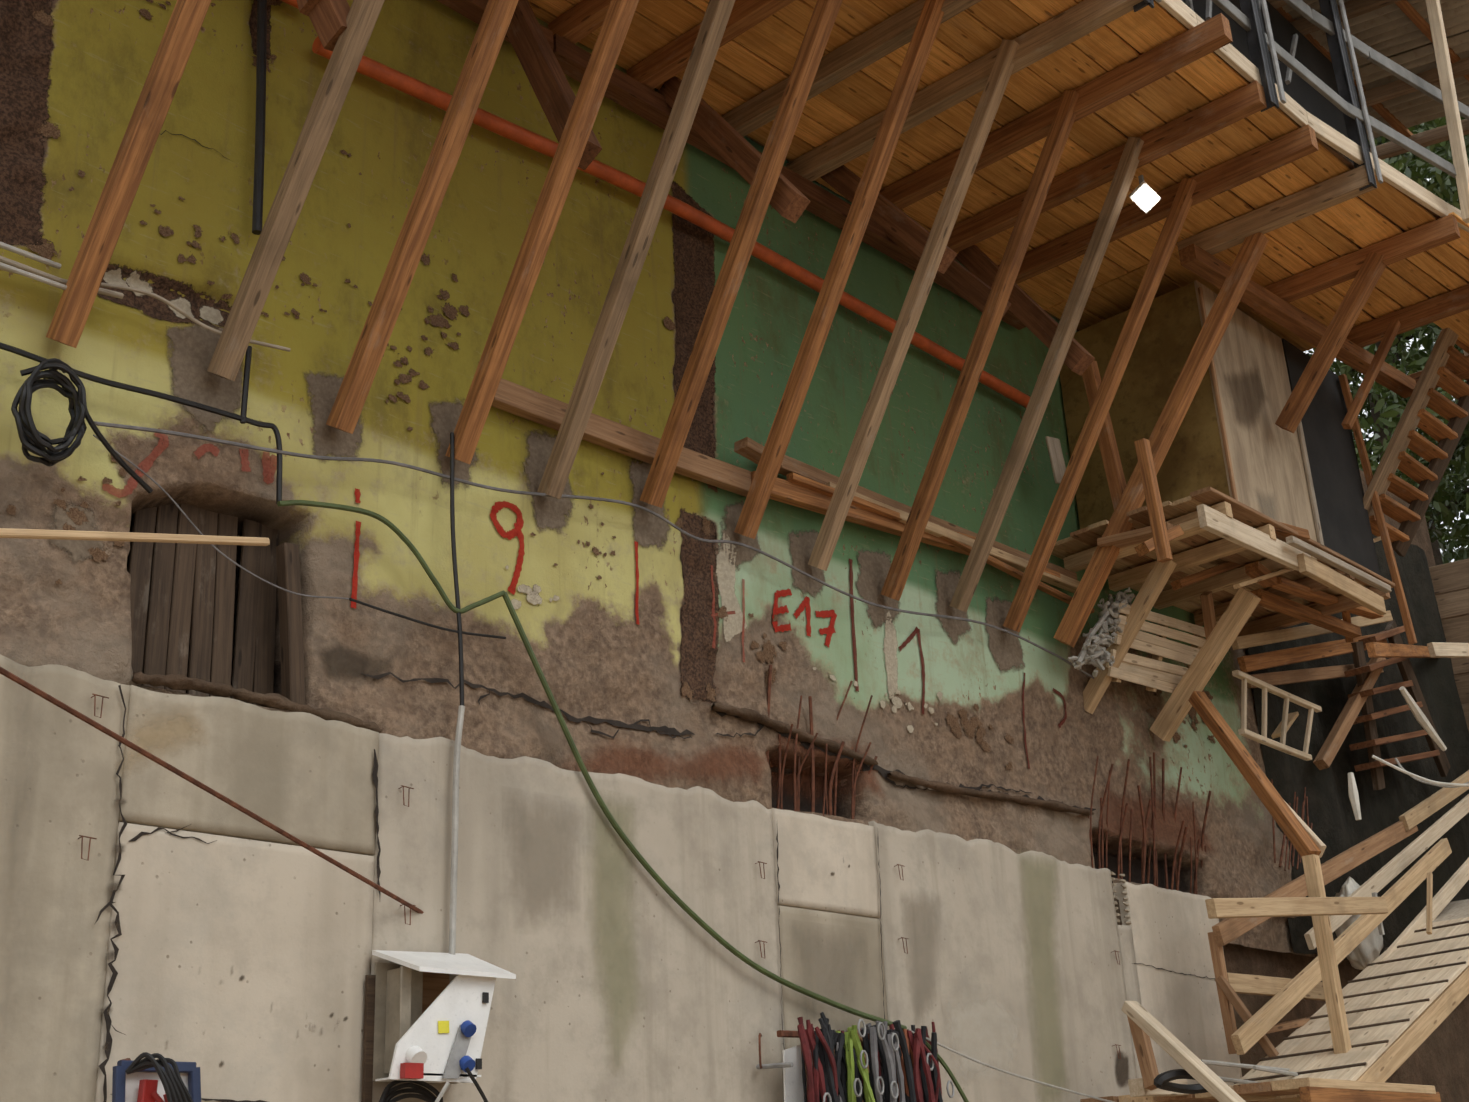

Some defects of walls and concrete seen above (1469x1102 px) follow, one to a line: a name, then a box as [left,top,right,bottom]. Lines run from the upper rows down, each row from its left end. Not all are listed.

flaking render [0,0,61,260]
spalling [97,256,233,328]
peeling [140,204,240,264]
flaking render [663,181,715,397]
flaking render [683,357,716,458]
peeling [577,504,616,557]
flaking render [675,509,728,703]
crack [361,672,1096,811]
spalling [766,667,1014,819]
crack [94,685,217,1102]
spalling [1088,752,1211,924]
crack [201,1094,267,1102]